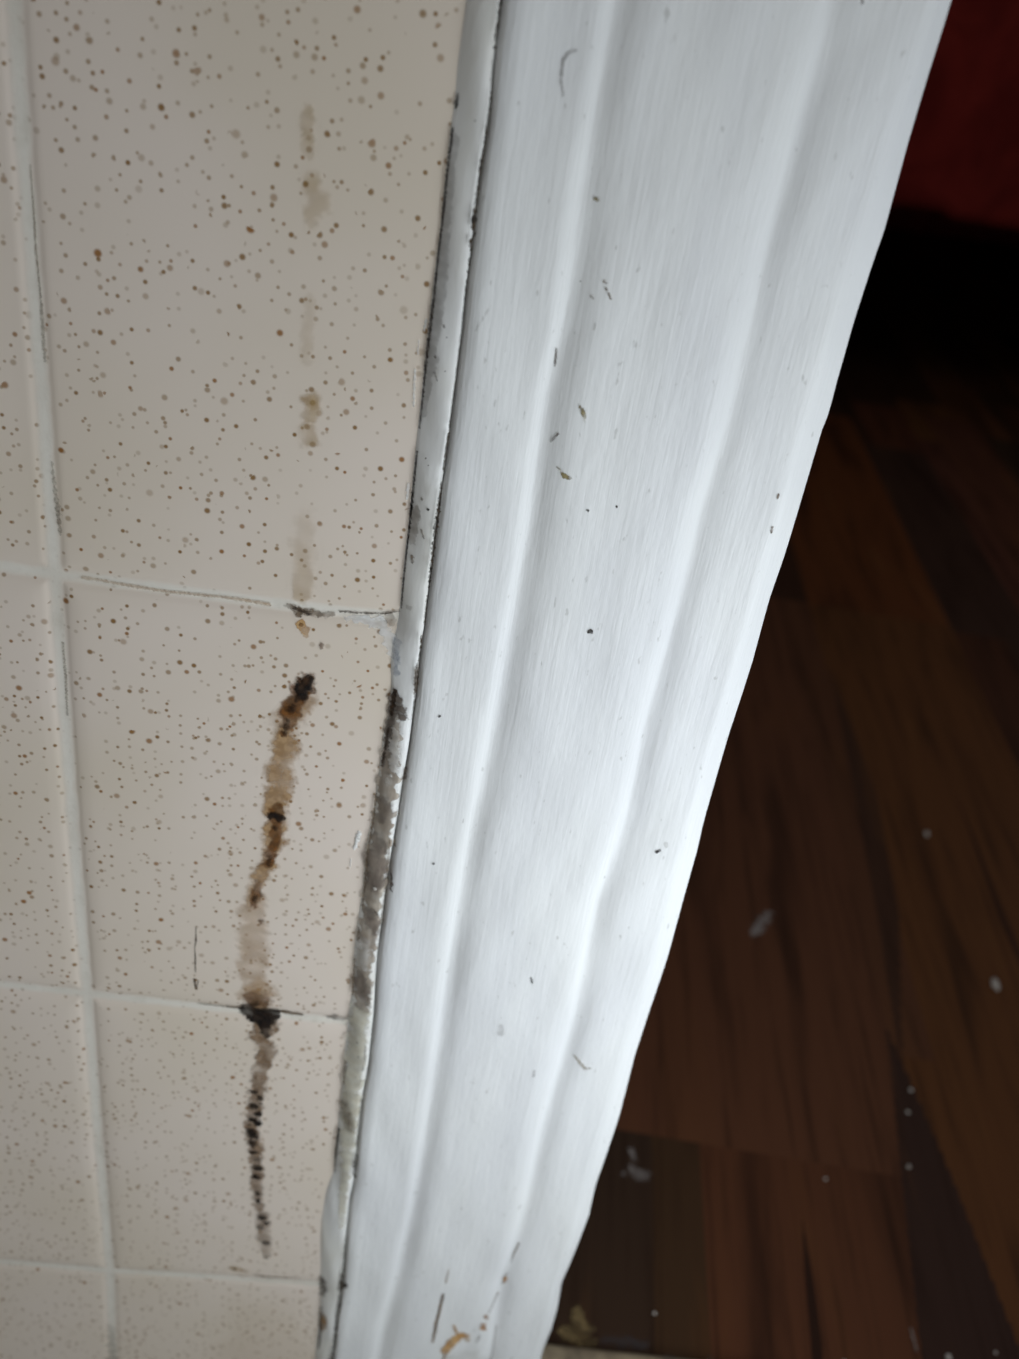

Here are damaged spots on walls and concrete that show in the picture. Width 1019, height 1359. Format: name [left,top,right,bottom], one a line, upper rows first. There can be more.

corrosion [247,675,316,908]
peeling [440,1325,469,1359]